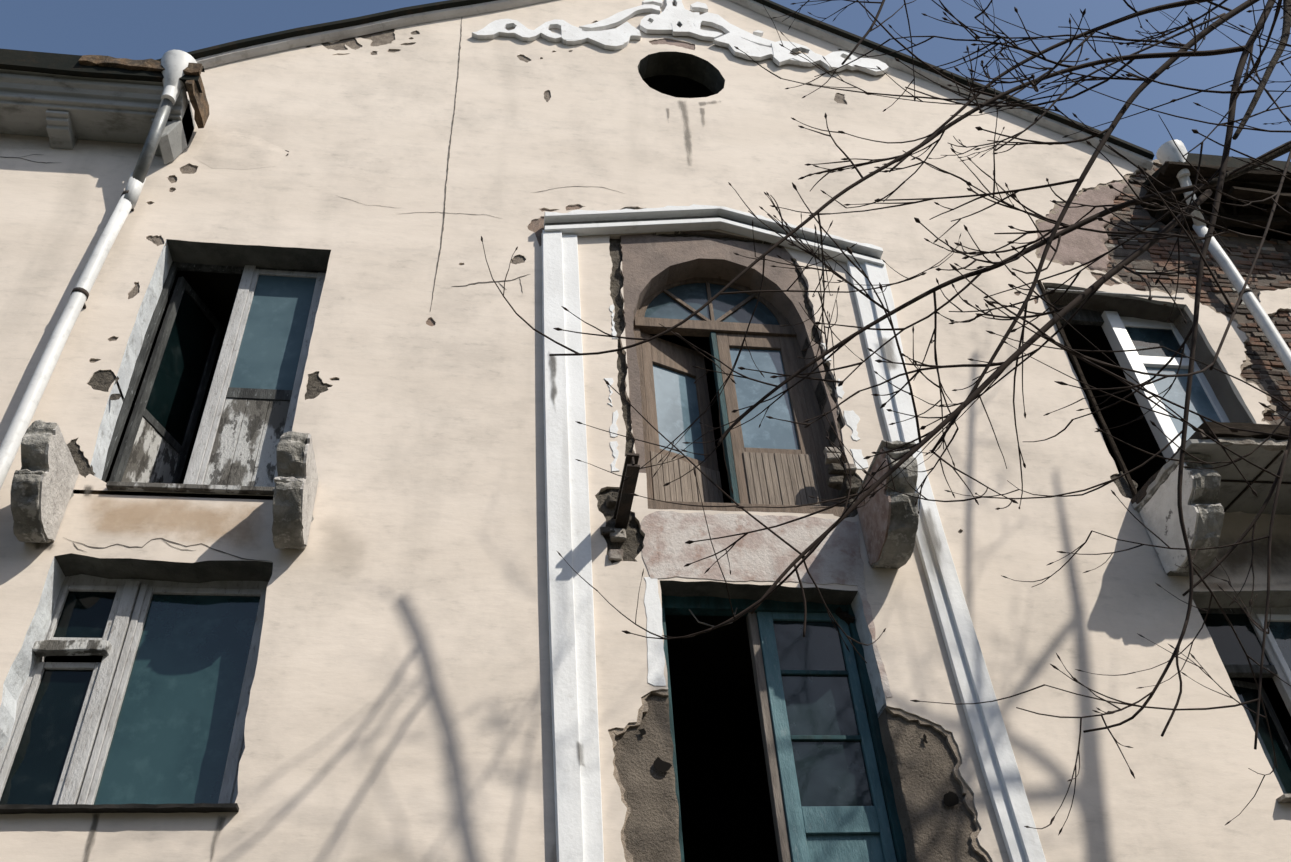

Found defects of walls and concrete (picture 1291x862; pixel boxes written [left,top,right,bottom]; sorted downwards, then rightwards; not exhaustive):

flaking render [307,29,419,55]
damp [667,102,715,150]
flaking render [168,164,198,192]
crack [336,18,529,311]
flaking render [1014,159,1291,427]
flaking render [88,360,121,400]
flaking render [305,372,339,400]
flaking render [1110,471,1138,499]
crack [63,537,272,562]
spalling [596,489,644,564]
flaking render [608,577,681,862]
flaking render [858,586,992,862]